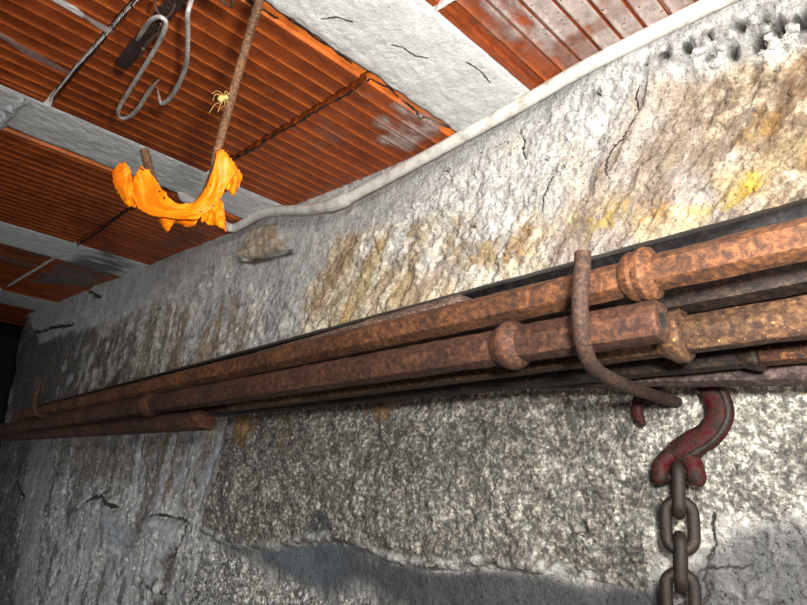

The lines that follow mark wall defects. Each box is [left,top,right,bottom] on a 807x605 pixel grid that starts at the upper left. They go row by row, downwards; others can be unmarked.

spalling [647,7,807,69]
corrosion [738,50,807,149]
crack [604,86,640,179]
corrosion [724,172,763,208]
corrosion [461,218,534,269]
crack [87,494,119,509]